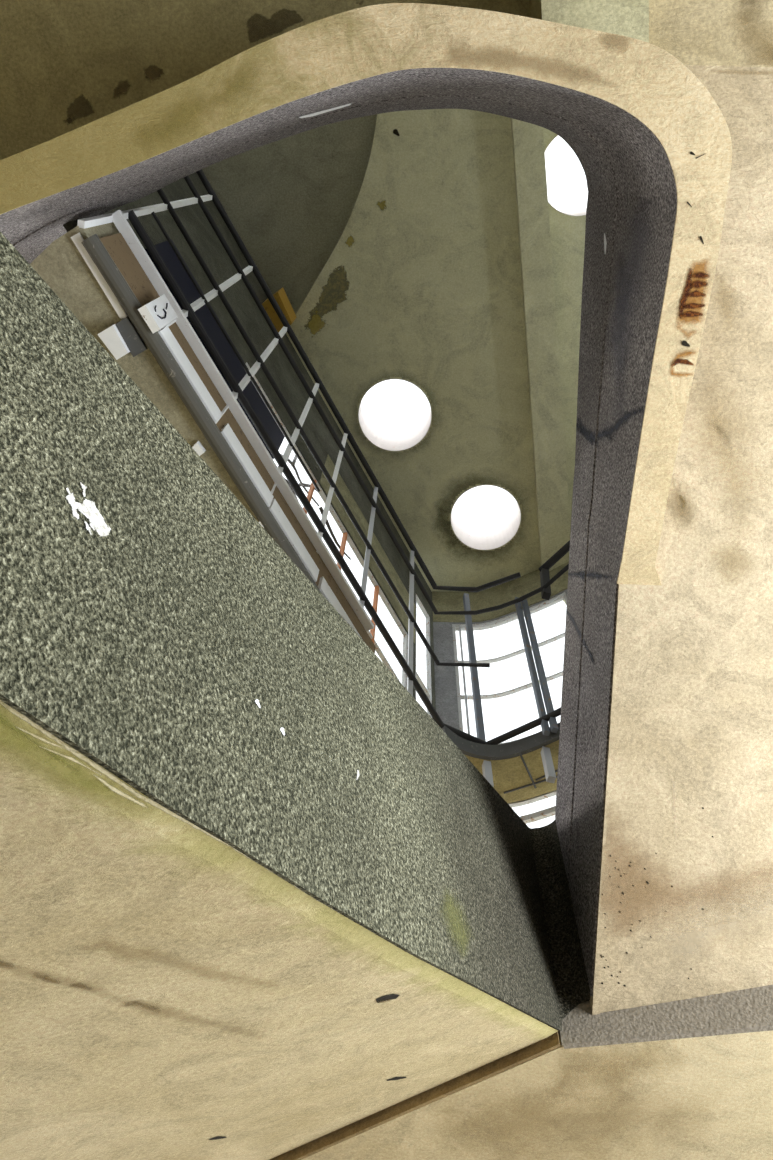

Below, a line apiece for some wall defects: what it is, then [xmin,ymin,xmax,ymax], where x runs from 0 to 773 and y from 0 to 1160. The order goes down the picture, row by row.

corrosion [671,262,710,376]
peeling [66,482,111,536]